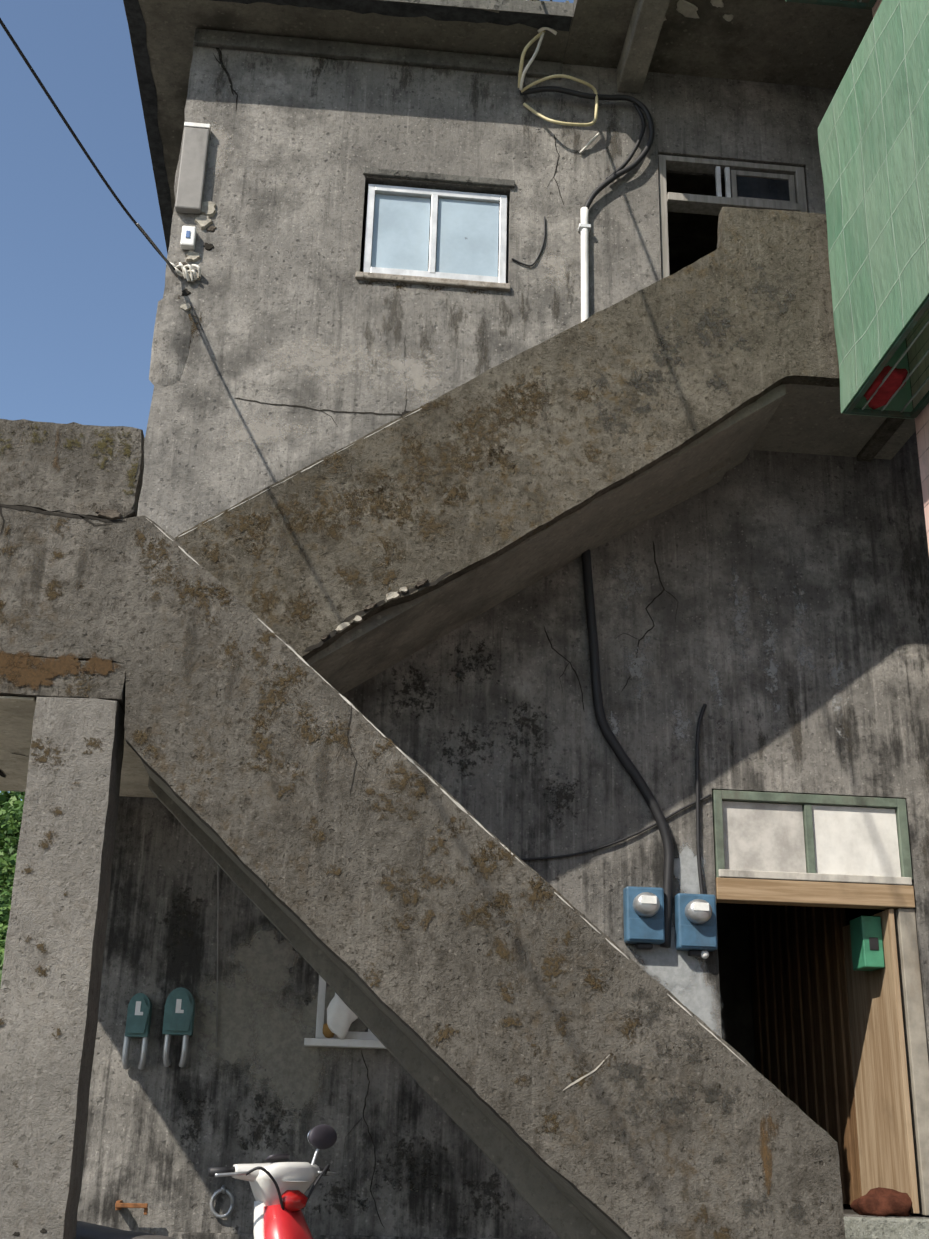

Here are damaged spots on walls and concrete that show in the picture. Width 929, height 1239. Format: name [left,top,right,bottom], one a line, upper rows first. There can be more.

spalling [664,0,734,21]
crack [214,48,238,109]
crack [0,504,125,534]
crack [618,542,678,692]
leakage [379,665,441,718]
leakage [431,700,557,777]